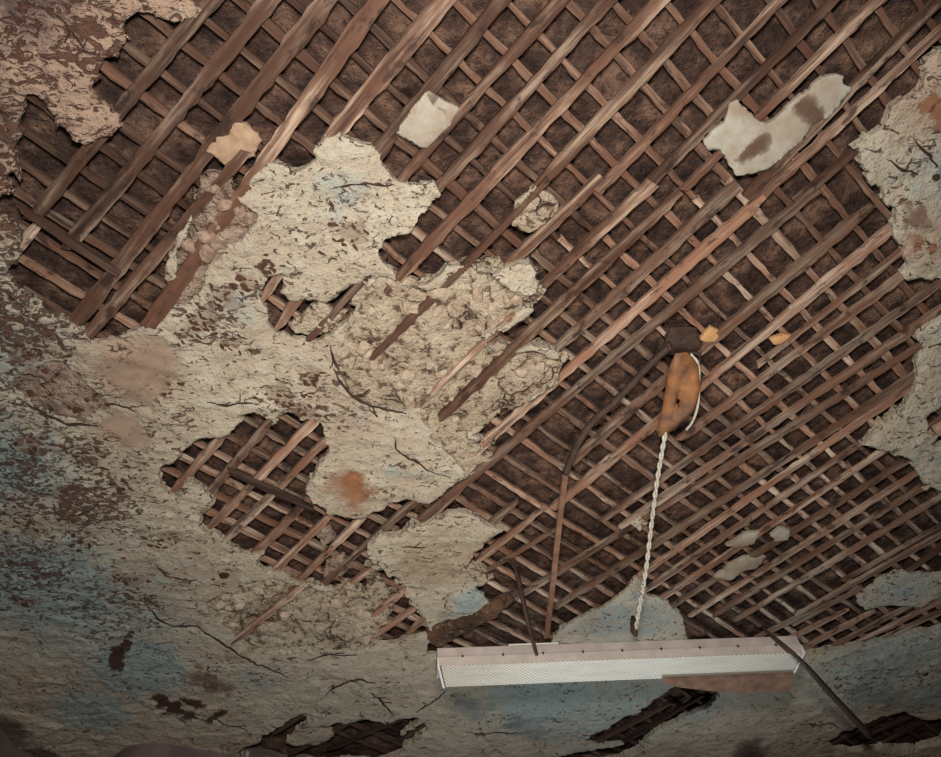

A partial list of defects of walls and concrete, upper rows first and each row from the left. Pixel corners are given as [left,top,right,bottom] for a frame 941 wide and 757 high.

crack [886,140,939,175]
peeling [327,200,370,251]
water stain [905,205,927,229]
flaking render [164,169,286,356]
flaking render [5,288,70,328]
flaking render [6,336,107,421]
flaking render [252,255,570,475]
peeling [65,447,134,502]
peeling [68,531,97,552]
peeling [147,533,177,549]
flaking render [208,565,406,652]
crack [144,598,289,678]